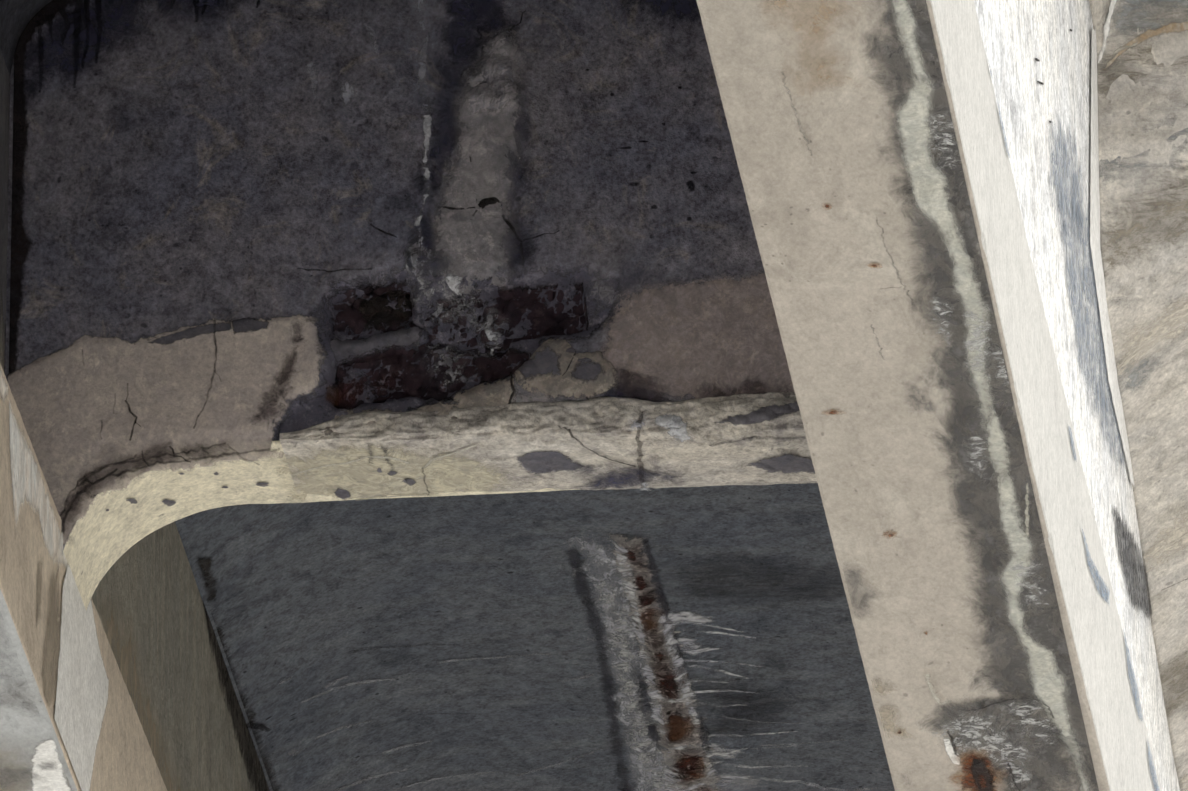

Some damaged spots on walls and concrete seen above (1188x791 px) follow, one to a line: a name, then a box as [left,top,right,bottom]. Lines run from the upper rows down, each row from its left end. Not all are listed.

water stain [0,0,180,791]
crack [60,320,280,534]
peeling [8,26,794,544]
crack [508,372,516,404]
crack [558,411,651,491]
water stain [585,466,676,490]
water stain [705,381,800,444]
water stain [749,454,815,474]
water stain [870,0,1099,791]
water stain [198,558,279,791]
water stain [567,536,675,791]
spalling [609,534,724,791]